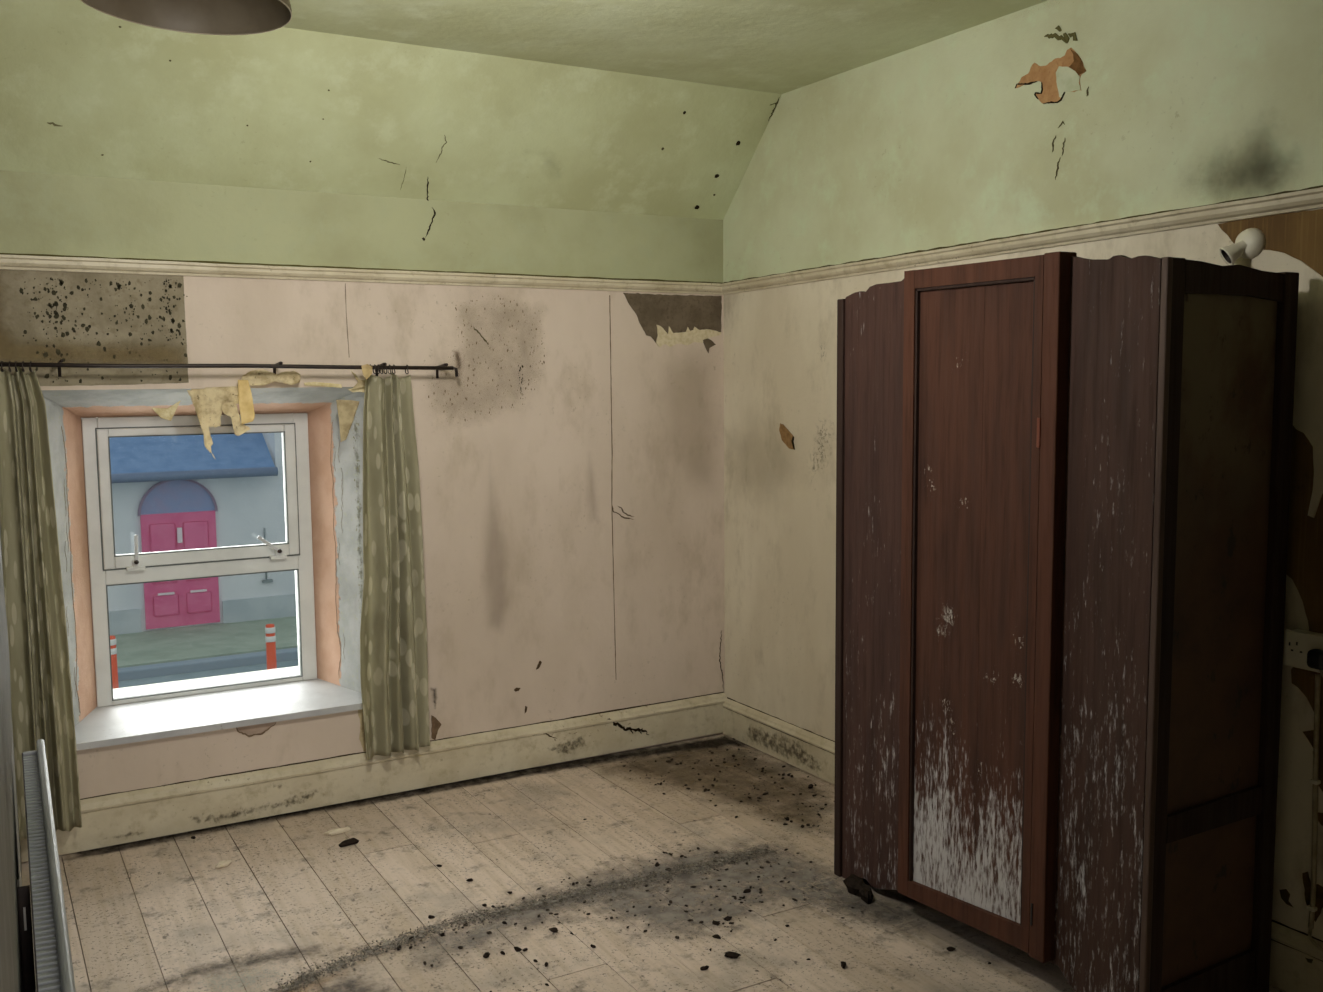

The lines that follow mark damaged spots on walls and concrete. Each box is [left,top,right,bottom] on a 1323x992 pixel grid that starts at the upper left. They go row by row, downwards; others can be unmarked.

spalling [1015,25,1086,104]
crack [381,135,447,241]
crack [1052,121,1065,180]
water stain [428,295,545,421]
peeling [623,293,722,353]
peeling [1218,209,1323,634]
peeling [236,722,276,737]
peeling [1291,667,1323,792]
water stain [1279,872,1323,922]